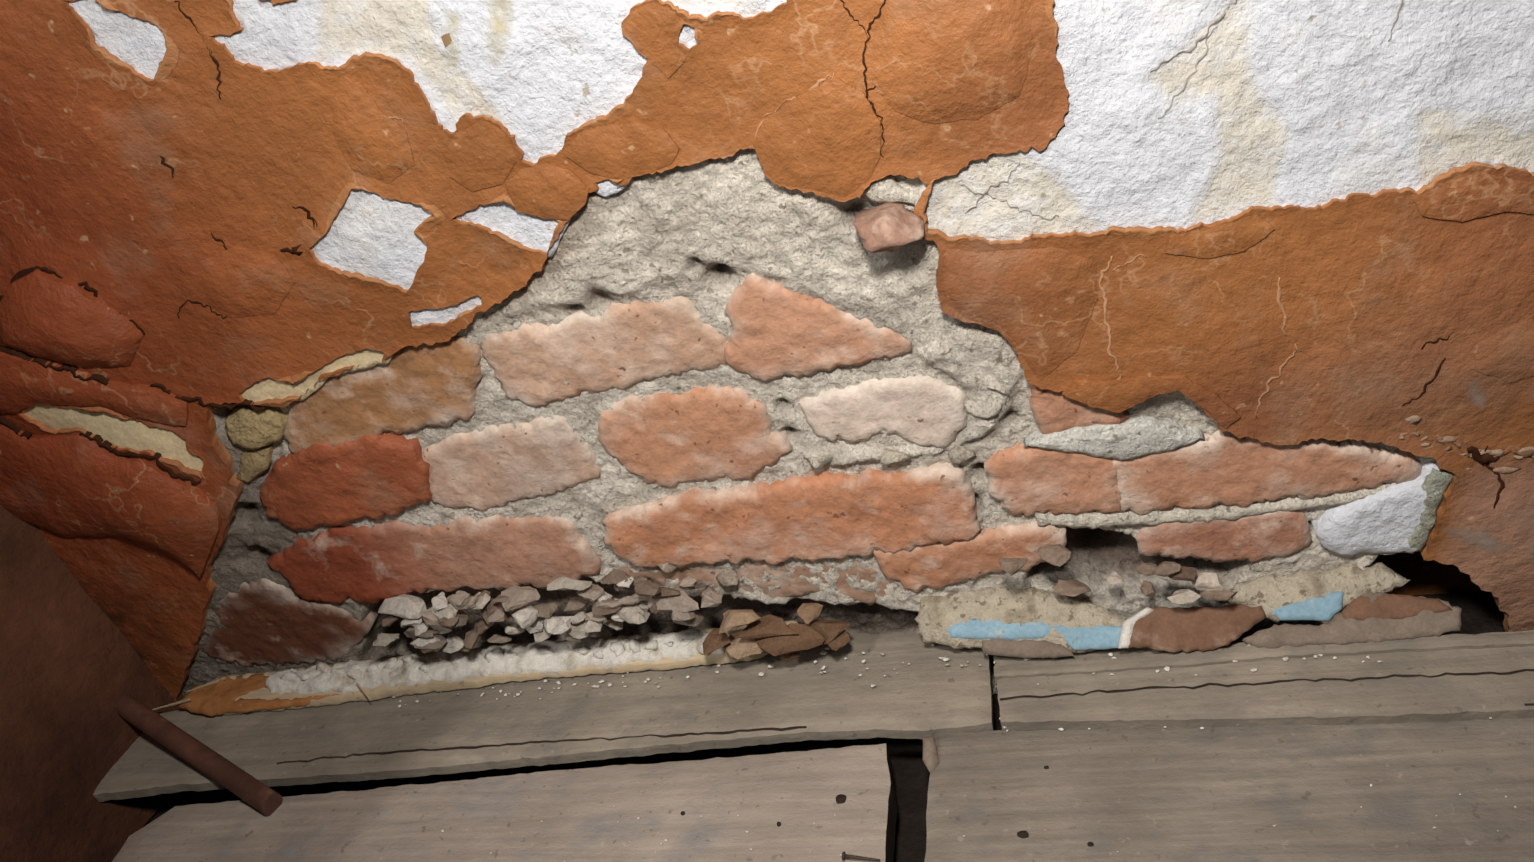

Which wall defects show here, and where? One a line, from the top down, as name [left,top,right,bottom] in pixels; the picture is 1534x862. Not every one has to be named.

peeling [69,0,179,83]
crack [755,0,886,157]
crack [0,266,145,335]
crack [177,300,227,319]
crack [0,416,32,439]
crack [0,345,109,385]
peeling [21,404,206,479]
crack [79,431,202,485]
crack [150,383,267,413]
flaking render [182,0,1534,696]